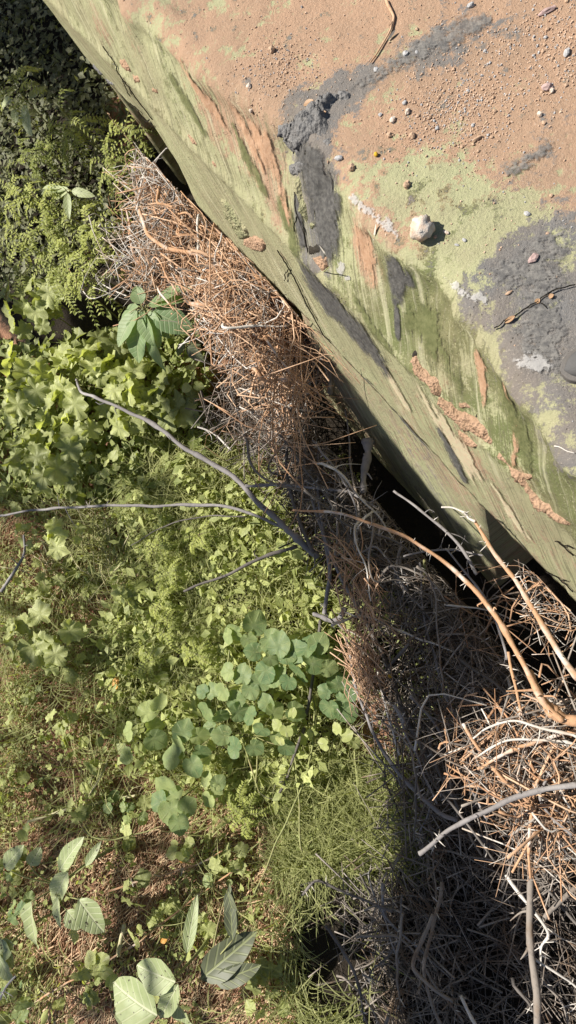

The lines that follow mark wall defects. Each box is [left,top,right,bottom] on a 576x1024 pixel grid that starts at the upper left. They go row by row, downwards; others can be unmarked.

damp [294,141,398,264]
crack [277,192,331,343]
damp [449,281,487,303]
damp [489,227,566,381]
rust [474,350,488,406]
rust [511,433,519,466]